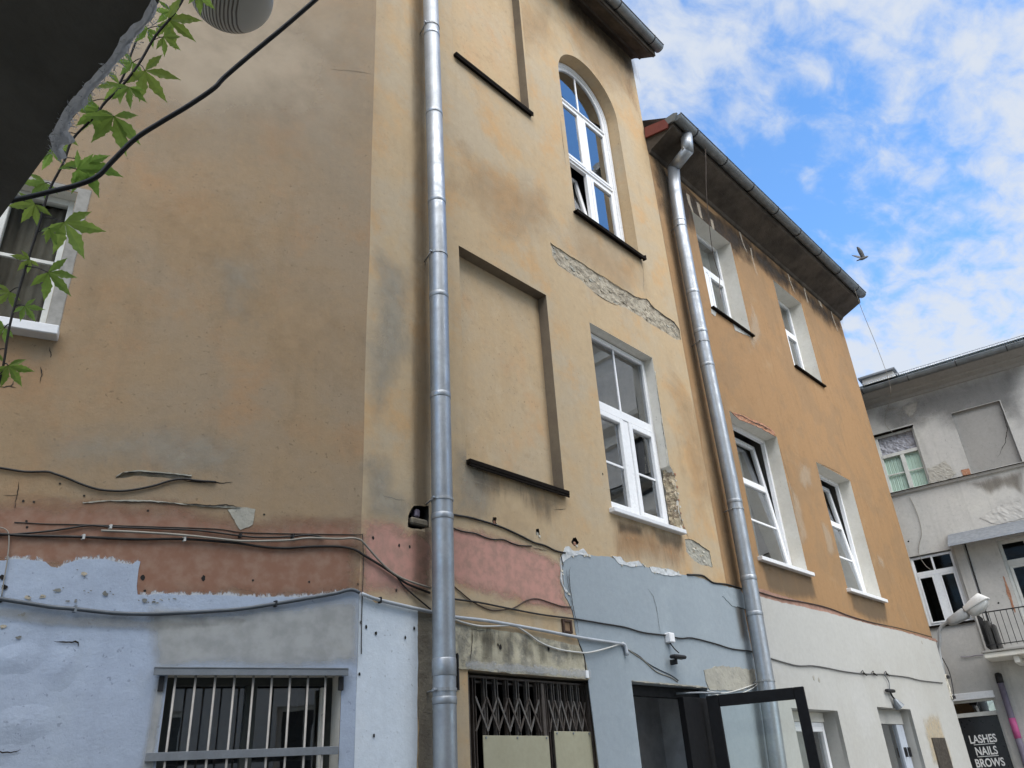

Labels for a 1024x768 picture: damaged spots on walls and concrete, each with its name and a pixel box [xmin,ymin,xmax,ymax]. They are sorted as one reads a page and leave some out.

damp [657,167,839,331]
flaking render [550,243,681,340]
peeling [560,537,591,595]
peeling [612,556,681,576]
flaking render [685,539,713,567]
peeling [18,587,114,616]